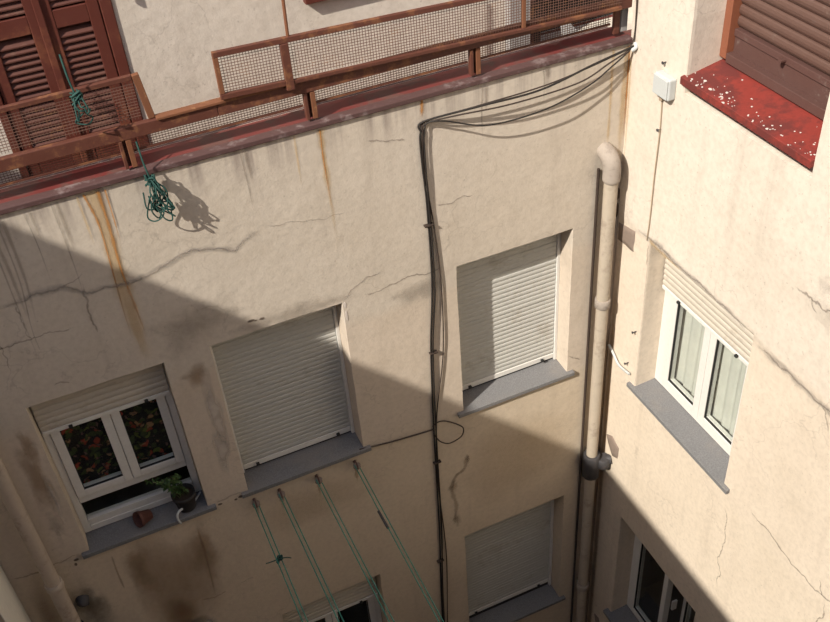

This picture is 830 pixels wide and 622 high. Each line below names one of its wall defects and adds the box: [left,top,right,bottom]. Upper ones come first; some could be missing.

corrosion [83,189,130,292]